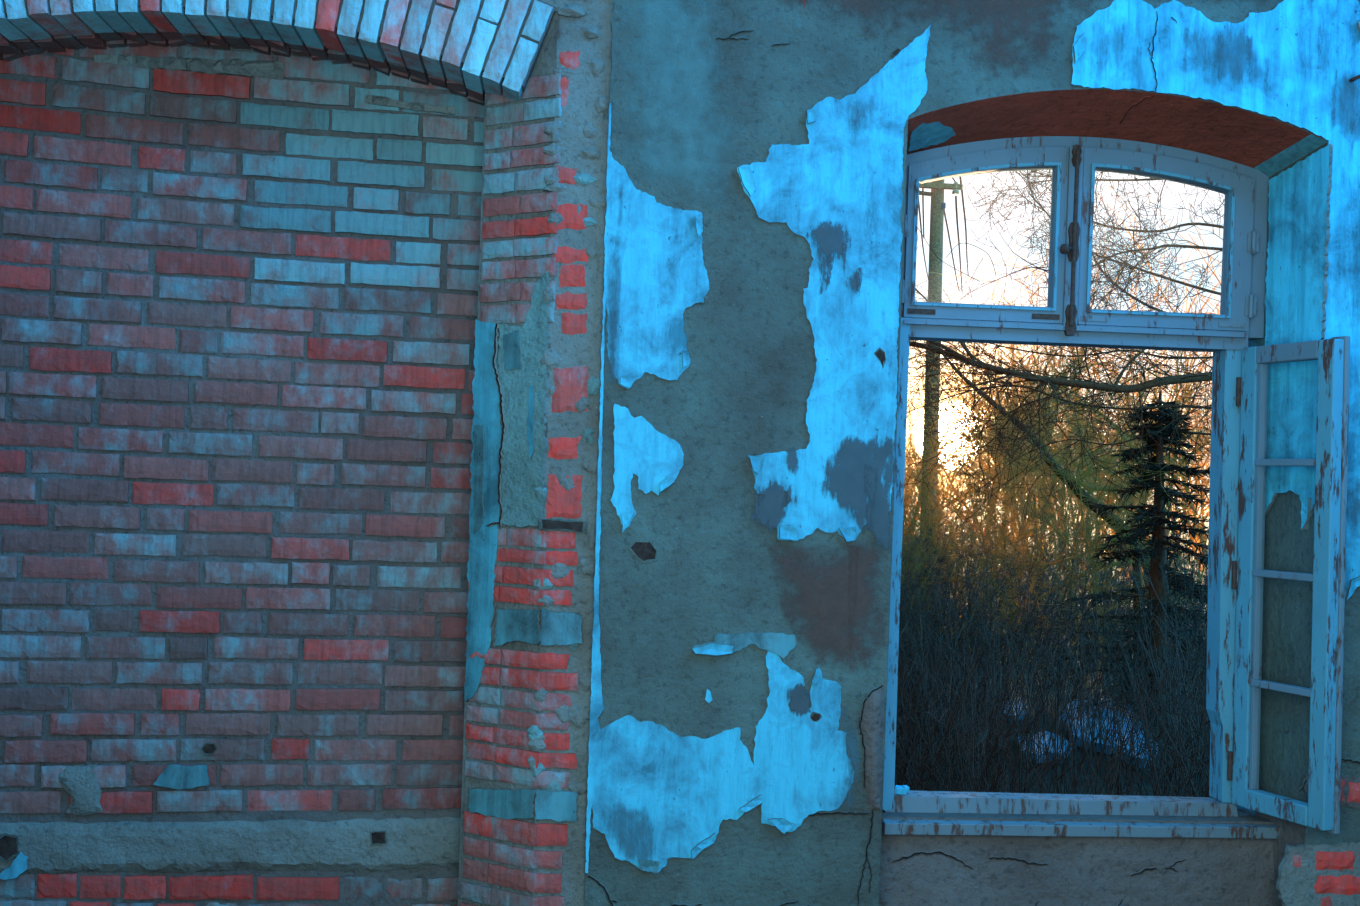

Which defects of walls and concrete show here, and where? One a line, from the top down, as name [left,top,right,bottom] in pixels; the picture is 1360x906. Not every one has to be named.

crack [1119,11,1177,124]
flaking render [737,25,956,542]
flaking render [1071,0,1360,601]
flaking render [464,39,854,873]
crack [808,684,1048,905]
crack [588,874,618,906]
crack [660,898,702,906]
crack [1113,858,1186,906]
flaking render [1276,842,1360,906]